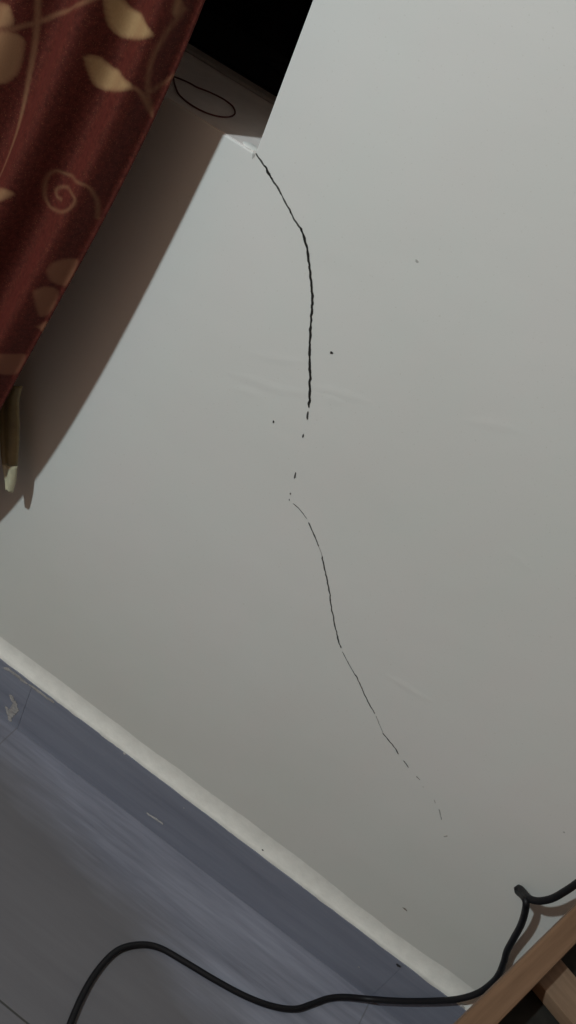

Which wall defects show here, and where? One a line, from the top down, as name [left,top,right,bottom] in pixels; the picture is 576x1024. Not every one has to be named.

crack [255,153,314,437]
crack [289,472,420,780]